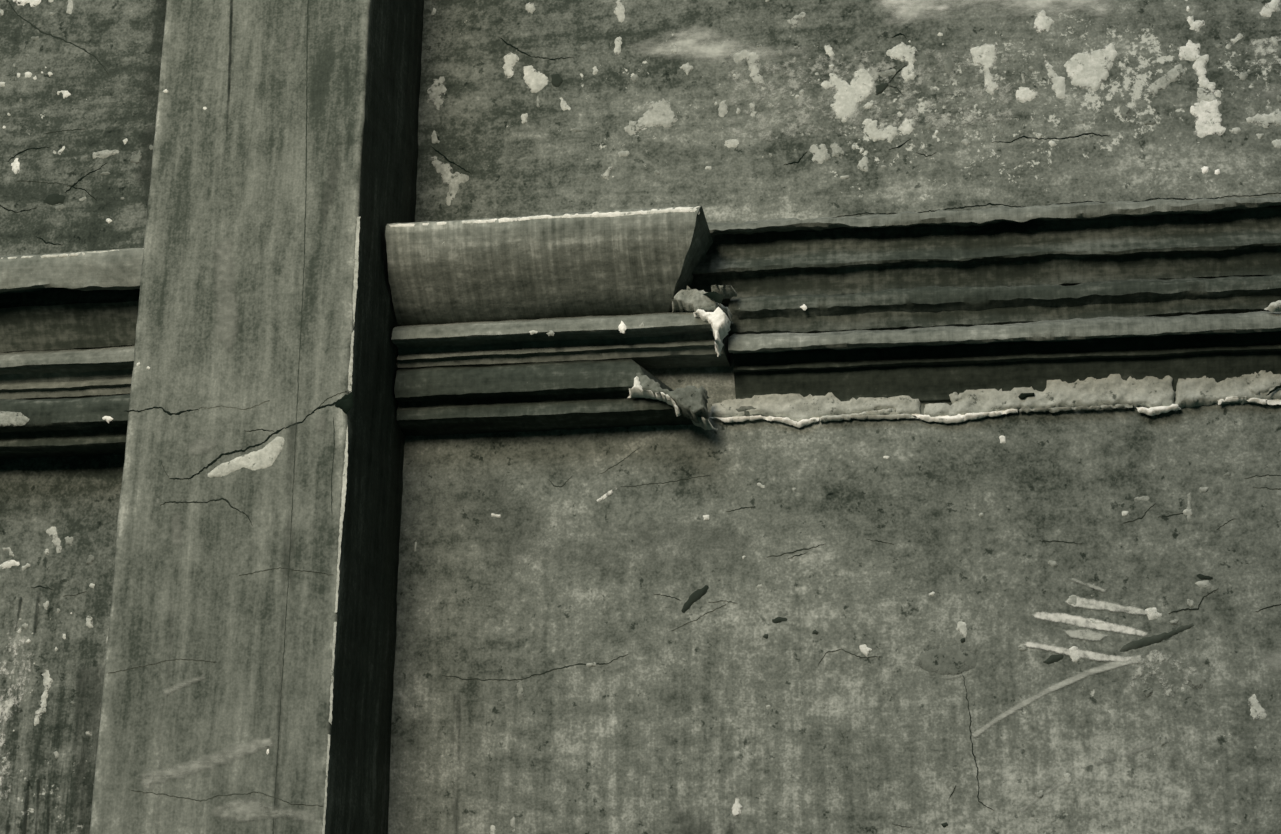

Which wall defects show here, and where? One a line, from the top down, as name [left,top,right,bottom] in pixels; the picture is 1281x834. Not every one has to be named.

peeling [0,0,73,16]
peeling [502,52,548,124]
peeling [794,32,1012,179]
peeling [1016,42,1118,103]
crack [0,129,106,245]
peeling [431,130,469,206]
spalling [671,285,737,357]
crack [126,0,349,834]
spalling [628,370,1281,430]
peeling [0,547,30,571]
spalling [1120,574,1217,652]
peeling [0,618,53,794]